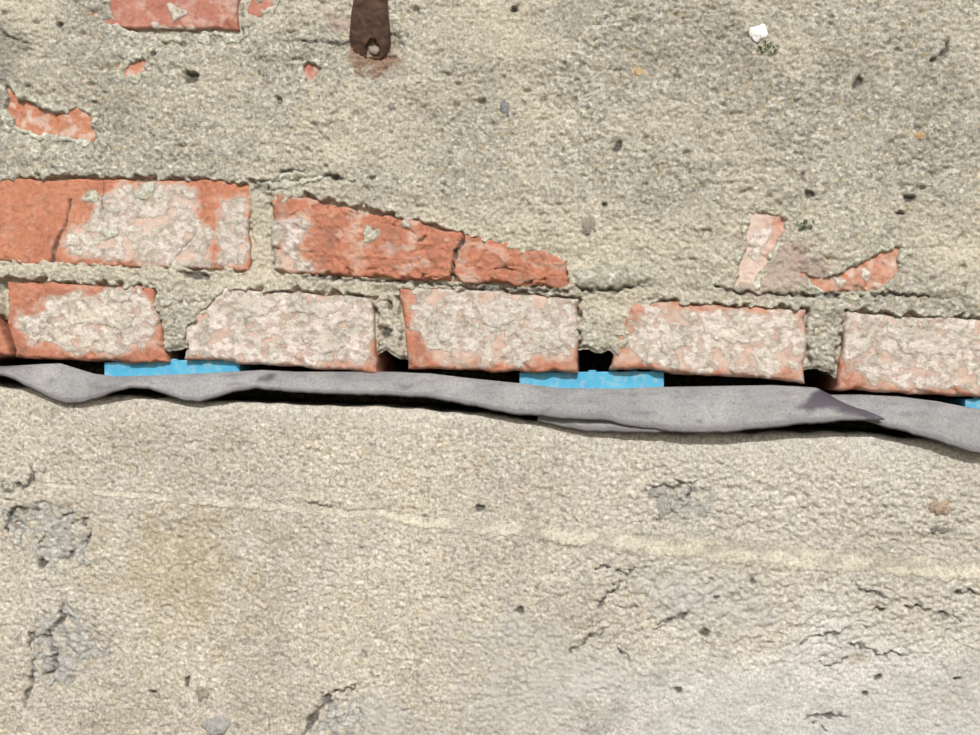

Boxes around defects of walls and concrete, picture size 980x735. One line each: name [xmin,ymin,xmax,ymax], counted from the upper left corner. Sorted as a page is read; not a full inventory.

flaking render [101,3,249,84]
flaking render [0,79,70,115]
flaking render [0,109,91,147]
crack [52,200,72,262]
peeling [66,181,392,368]
flaking render [734,201,783,290]
crack [1,469,47,530]
spalling [3,501,91,574]
crack [906,589,980,622]
spalling [31,602,111,686]
crack [801,631,902,666]